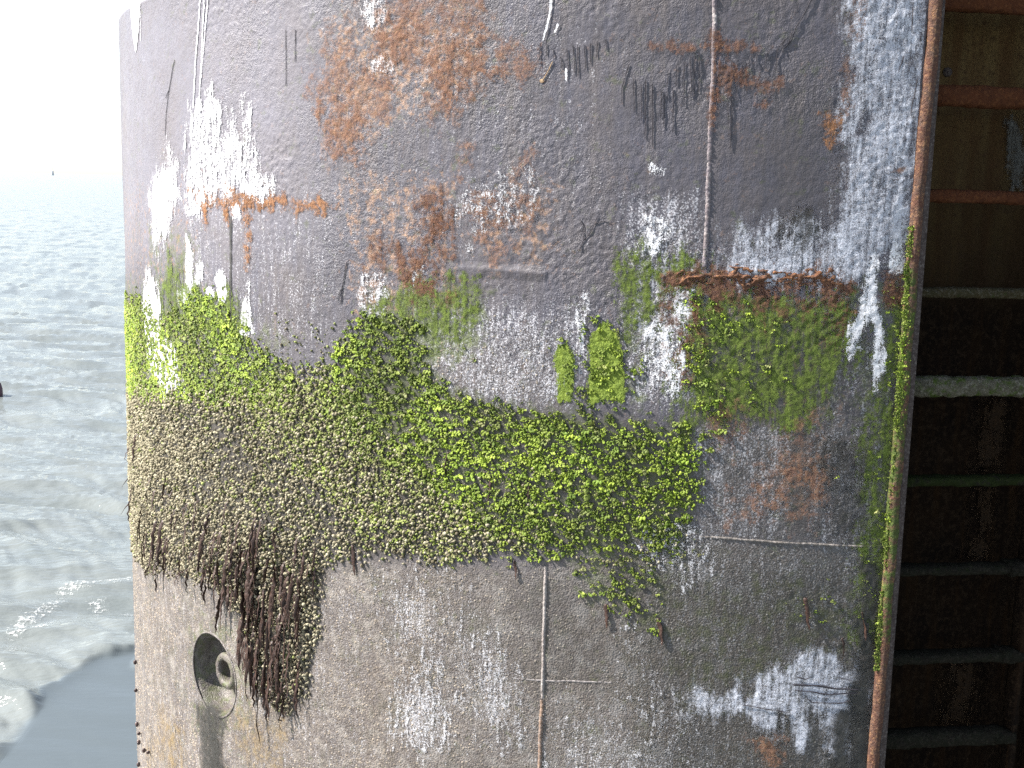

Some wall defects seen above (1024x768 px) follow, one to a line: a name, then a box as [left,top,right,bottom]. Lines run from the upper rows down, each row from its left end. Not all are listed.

corrosion [307,0,530,158]
damp [217,216,232,353]
corrosion [187,183,339,272]
corrosion [369,184,455,302]
corrosion [658,260,858,387]